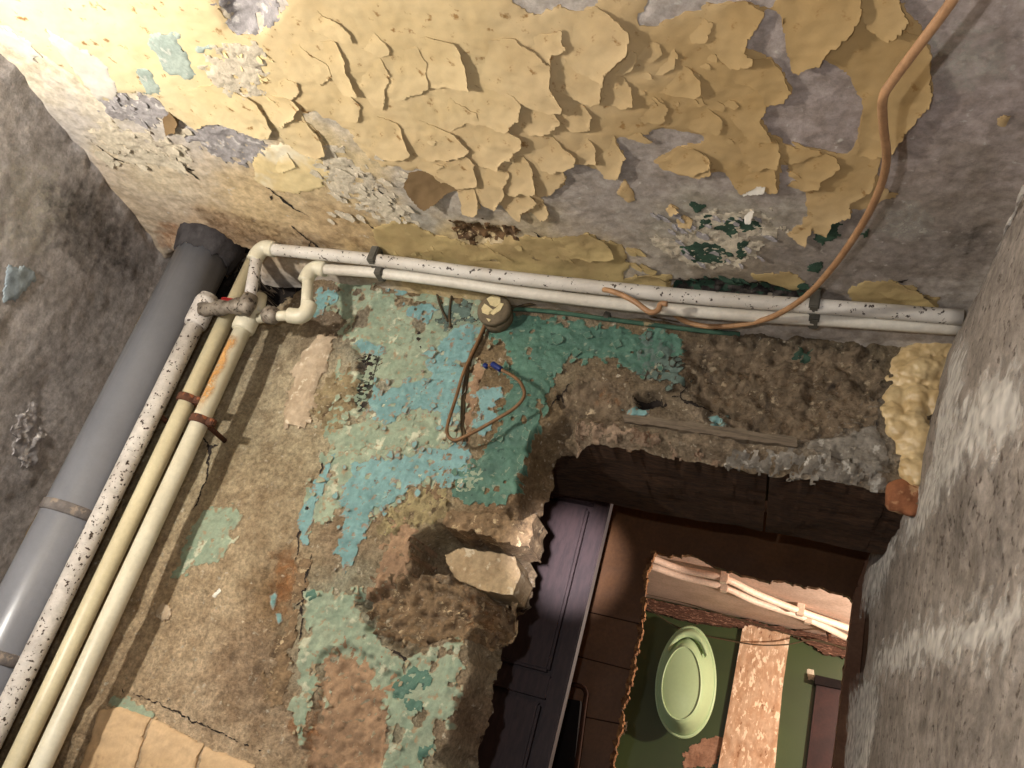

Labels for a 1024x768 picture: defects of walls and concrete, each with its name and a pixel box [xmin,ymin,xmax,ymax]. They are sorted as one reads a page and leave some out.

peeling [0,0,934,303]
hole [257,275,302,307]
peeling [848,280,940,307]
rust [200,337,235,401]
peeling [170,498,244,580]
flaking render [260,282,888,768]
crack [122,689,261,751]